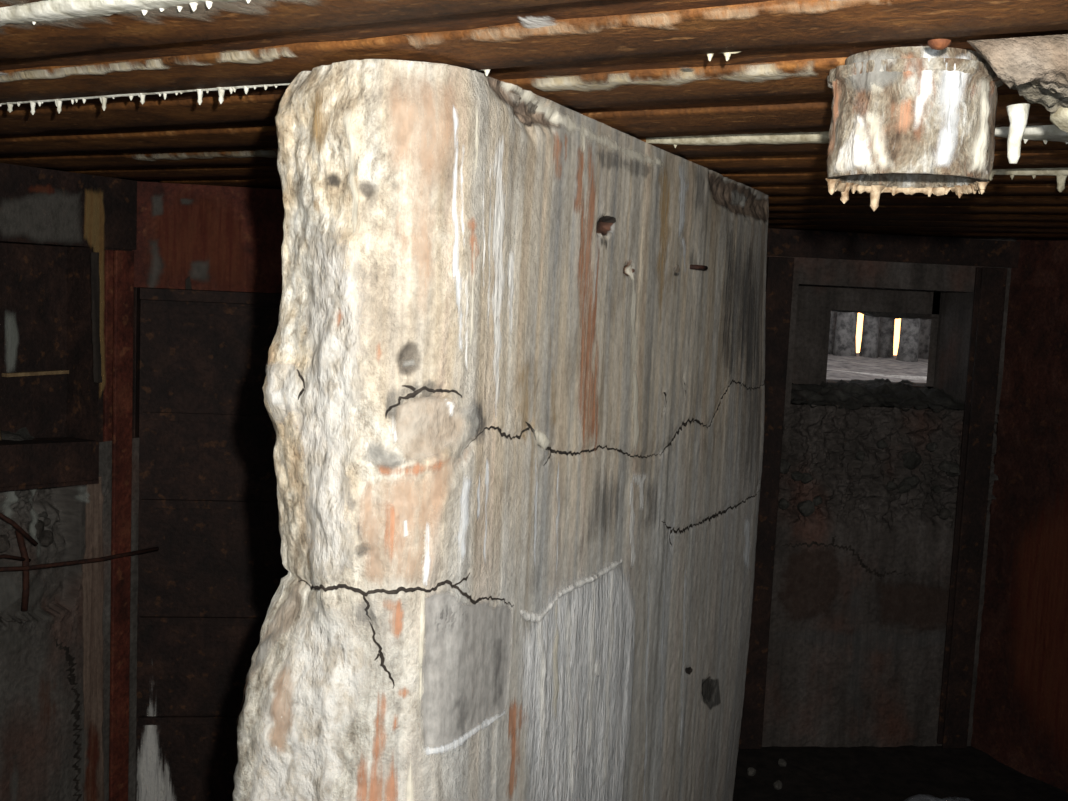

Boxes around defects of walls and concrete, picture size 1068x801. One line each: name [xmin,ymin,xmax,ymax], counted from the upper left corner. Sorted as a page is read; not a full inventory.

efflorescence [0,0,266,27]
efflorescence [473,17,588,42]
efflorescence [632,13,678,30]
efflorescence [705,7,729,20]
efflorescence [0,59,167,82]
efflorescence [222,49,294,64]
efflorescence [0,83,290,115]
crack [385,385,462,418]
crack [463,379,766,466]
crack [661,487,759,546]
crack [299,573,514,688]
corrosion [357,701,396,801]